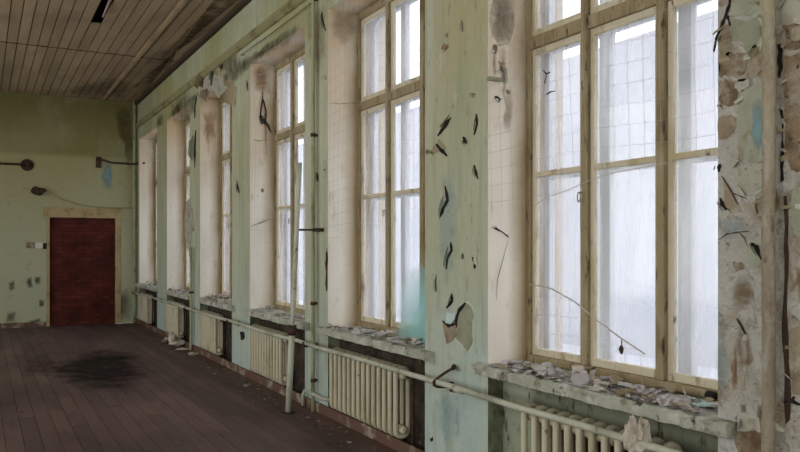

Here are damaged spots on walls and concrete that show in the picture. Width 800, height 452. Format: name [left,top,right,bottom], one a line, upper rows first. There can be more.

peeling [189,63,248,118]
peeling [712,0,762,171]
peeling [425,114,451,157]
peeling [438,186,449,219]
spalling [713,164,742,214]
spalling [775,0,800,447]
peeling [733,243,761,272]
spalling [442,293,476,353]
spalling [734,417,761,452]